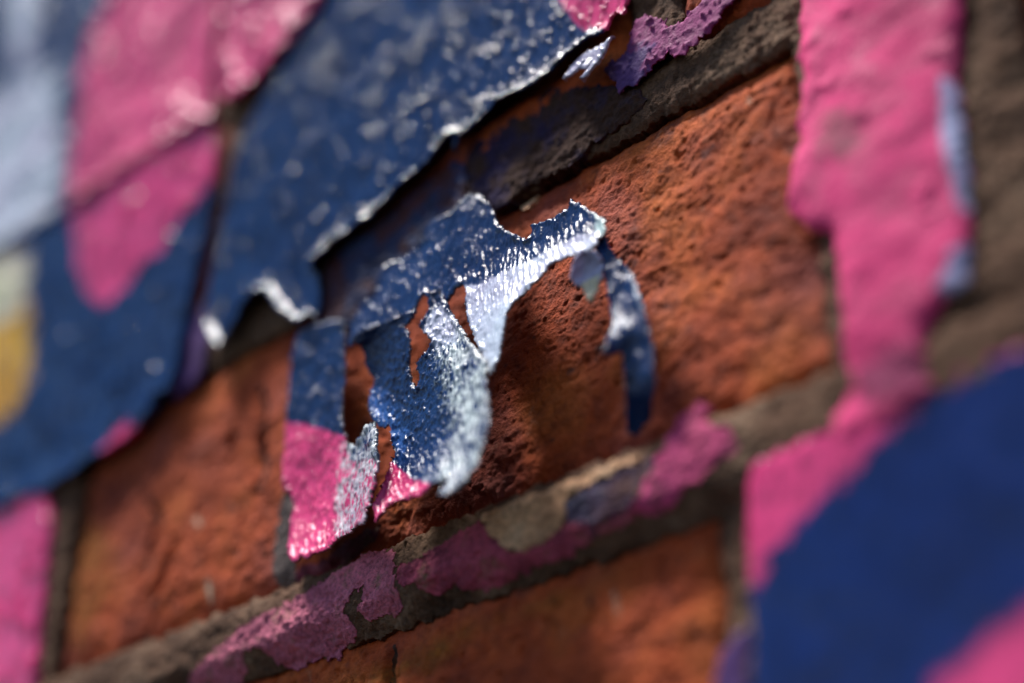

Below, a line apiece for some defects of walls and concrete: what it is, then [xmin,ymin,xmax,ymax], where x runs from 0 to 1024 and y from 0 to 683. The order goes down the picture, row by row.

peeling [282,0,735,563]